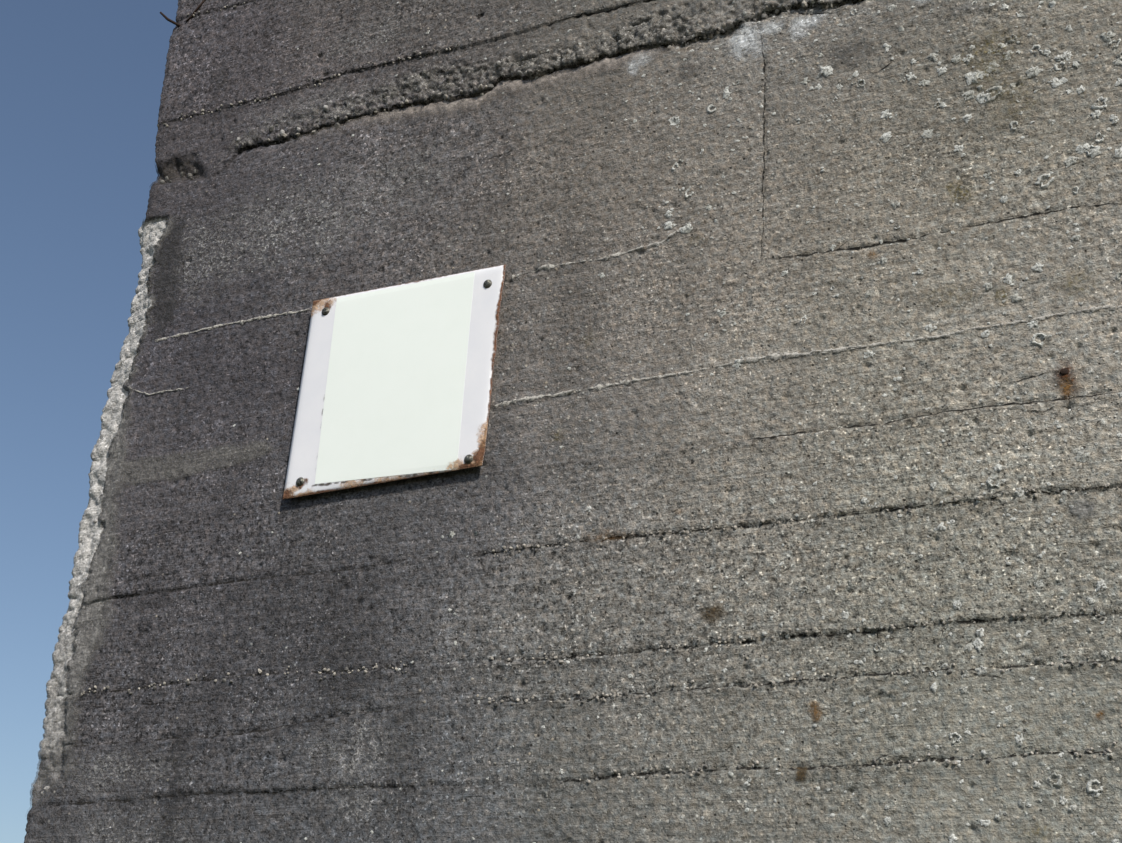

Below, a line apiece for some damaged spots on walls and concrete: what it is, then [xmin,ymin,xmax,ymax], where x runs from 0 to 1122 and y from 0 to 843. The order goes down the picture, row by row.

crack [187,1,255,17]
crack [157,44,458,127]
crack [237,0,1118,264]
spalling [38,217,170,798]
crack [474,483,1121,560]
crack [485,607,1116,666]
crack [488,654,1121,706]
crack [560,741,1118,783]
crack [43,785,407,805]